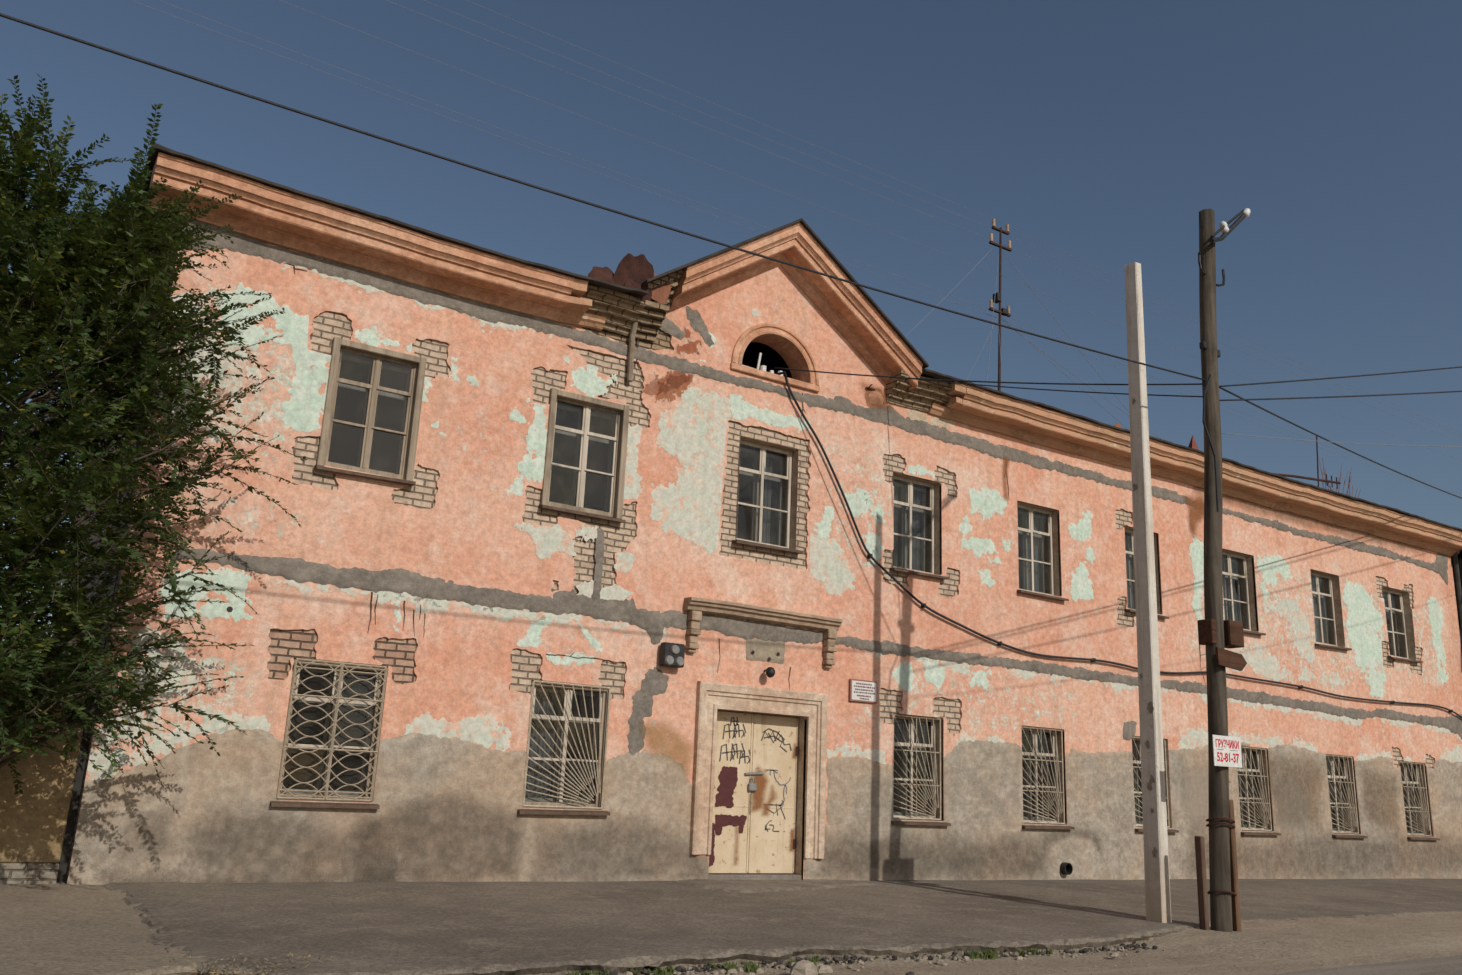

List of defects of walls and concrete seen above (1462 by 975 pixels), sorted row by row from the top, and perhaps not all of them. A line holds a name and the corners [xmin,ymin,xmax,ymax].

peeling [281,262,390,296]
peeling [468,315,553,339]
peeling [157,282,479,490]
flaking render [391,465,439,509]
peeling [507,326,1014,601]
peeling [1189,534,1205,635]
peeling [85,567,642,782]
peeling [875,652,1207,746]
peeling [1178,727,1208,750]
peeling [1225,554,1462,769]
water stain [362,806,515,882]
water stain [831,847,1039,872]